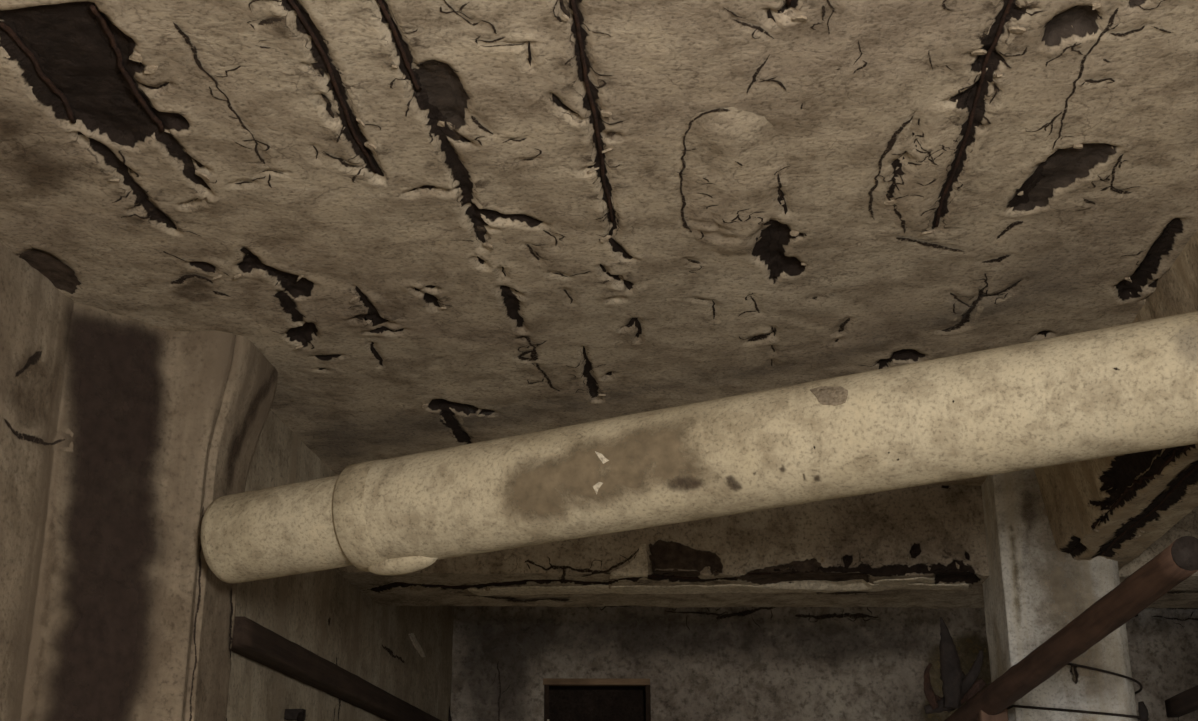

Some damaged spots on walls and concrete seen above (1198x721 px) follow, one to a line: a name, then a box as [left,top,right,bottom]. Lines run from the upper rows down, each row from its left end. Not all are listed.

spalling [0,1,217,236]
spalling [367,0,543,264]
spalling [550,0,634,290]
spalling [920,0,1117,235]
spalling [500,267,524,327]
spalling [752,190,807,284]
spalling [1115,218,1183,301]
water stain [507,426,703,517]
spalling [1060,444,1198,558]
crack [463,549,639,611]
flaking render [359,534,980,596]
crack [667,592,878,629]